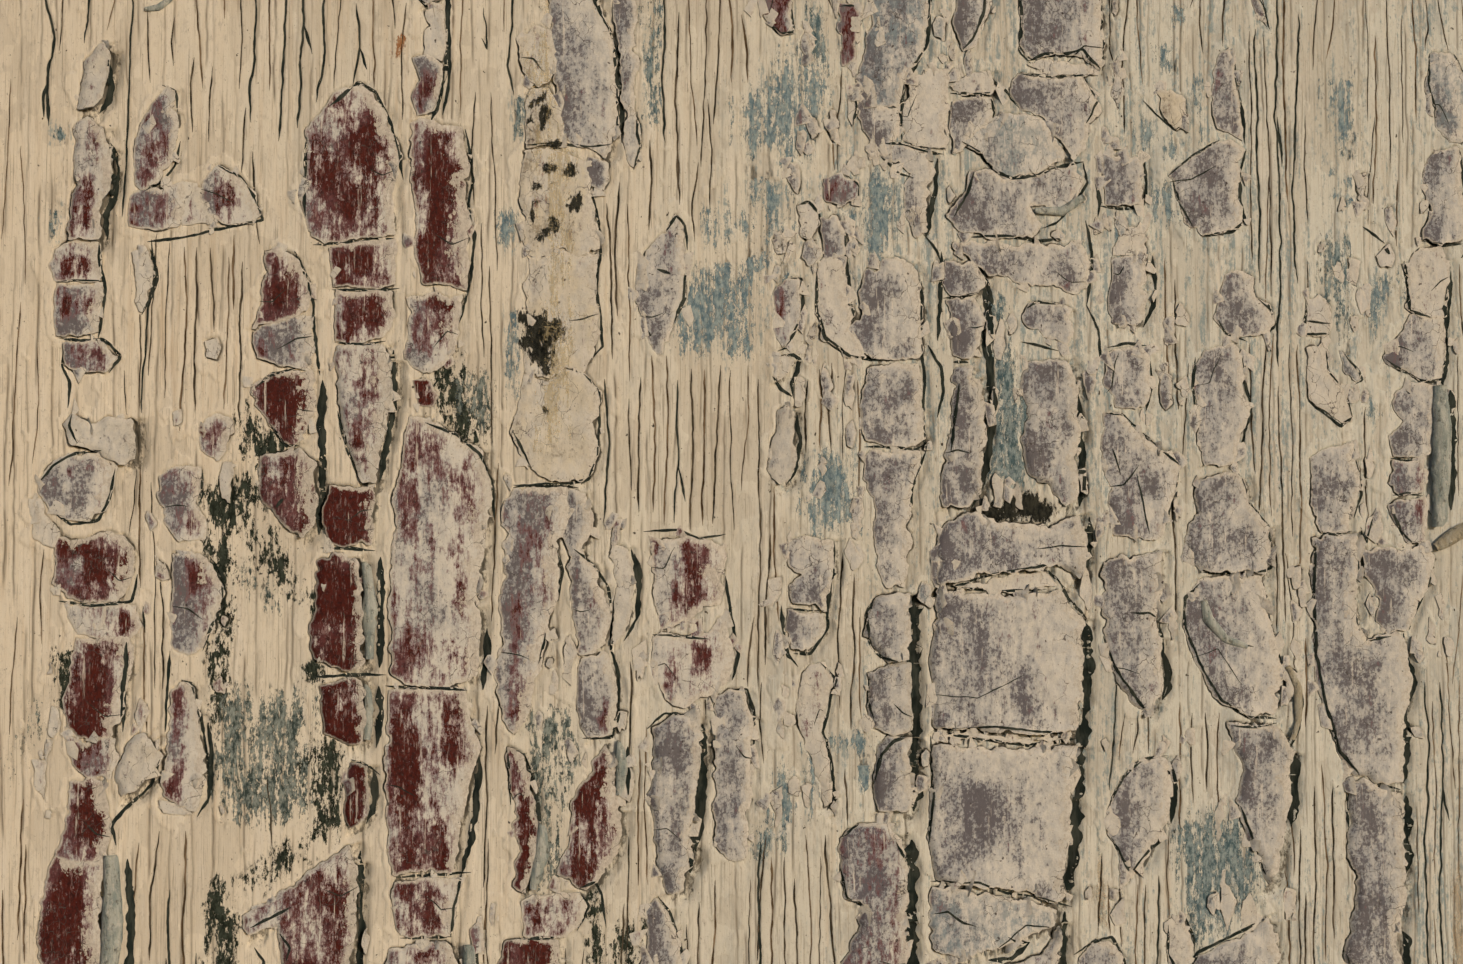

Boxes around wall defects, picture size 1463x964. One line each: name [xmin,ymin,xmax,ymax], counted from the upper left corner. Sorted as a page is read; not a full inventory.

peeling [28,40,264,964]
crack [129,467,165,731]
peeling [145,0,172,11]
crack [134,831,197,964]
crack [2,0,407,481]
water stain [198,398,354,964]
crack [442,0,514,645]
peeling [242,0,844,964]
peeling [764,0,1463,964]
crack [1098,683,1220,964]
crack [1285,765,1335,964]
crack [1190,0,1463,727]